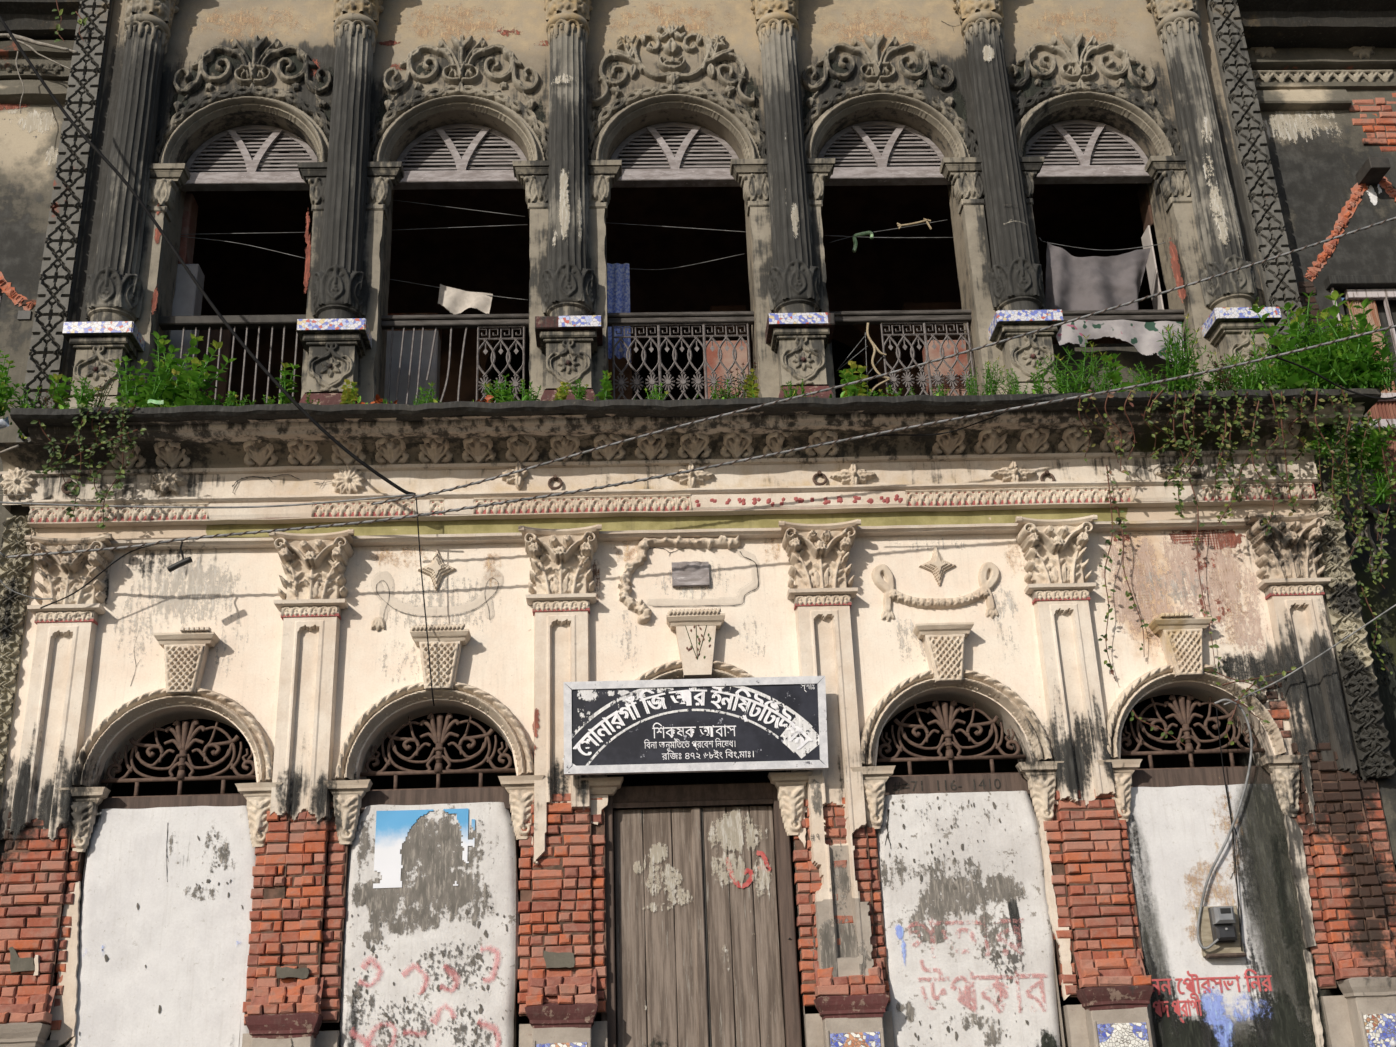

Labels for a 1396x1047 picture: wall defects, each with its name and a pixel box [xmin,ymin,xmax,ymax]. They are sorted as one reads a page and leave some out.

flaking render [1262,93,1396,152]
damp [1211,569,1355,772]
damp [1367,620,1396,772]
flaking render [0,812,86,1047]
flaking render [185,793,608,1047]
peeling [708,807,770,896]
flaking render [792,796,1029,1047]
flaking render [1038,787,1152,1000]
flaking render [1262,681,1396,1047]